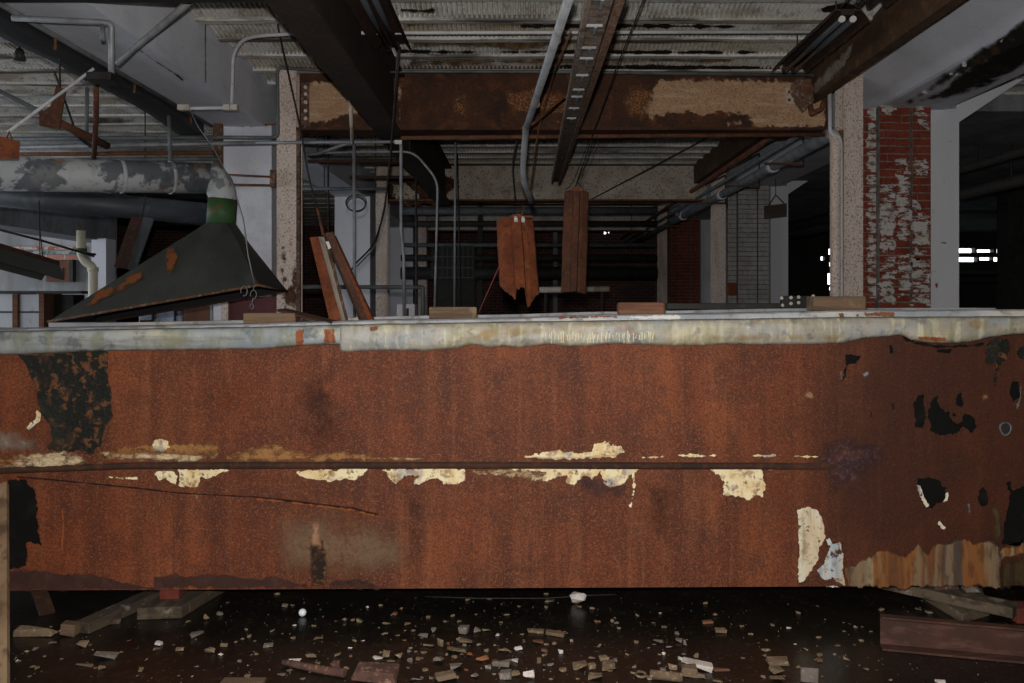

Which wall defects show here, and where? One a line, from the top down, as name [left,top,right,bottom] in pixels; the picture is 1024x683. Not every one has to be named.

peeling [643,45,852,127]
peeling [857,104,946,317]
corrosion [87,217,143,306]
corrosion [296,329,304,345]
corrosion [324,329,335,343]
peeling [0,451,82,468]
crack [17,476,378,516]
peeling [96,439,663,508]
peeling [679,453,776,500]
corrosion [310,523,327,586]
damp [289,530,393,564]
peeling [797,507,845,588]